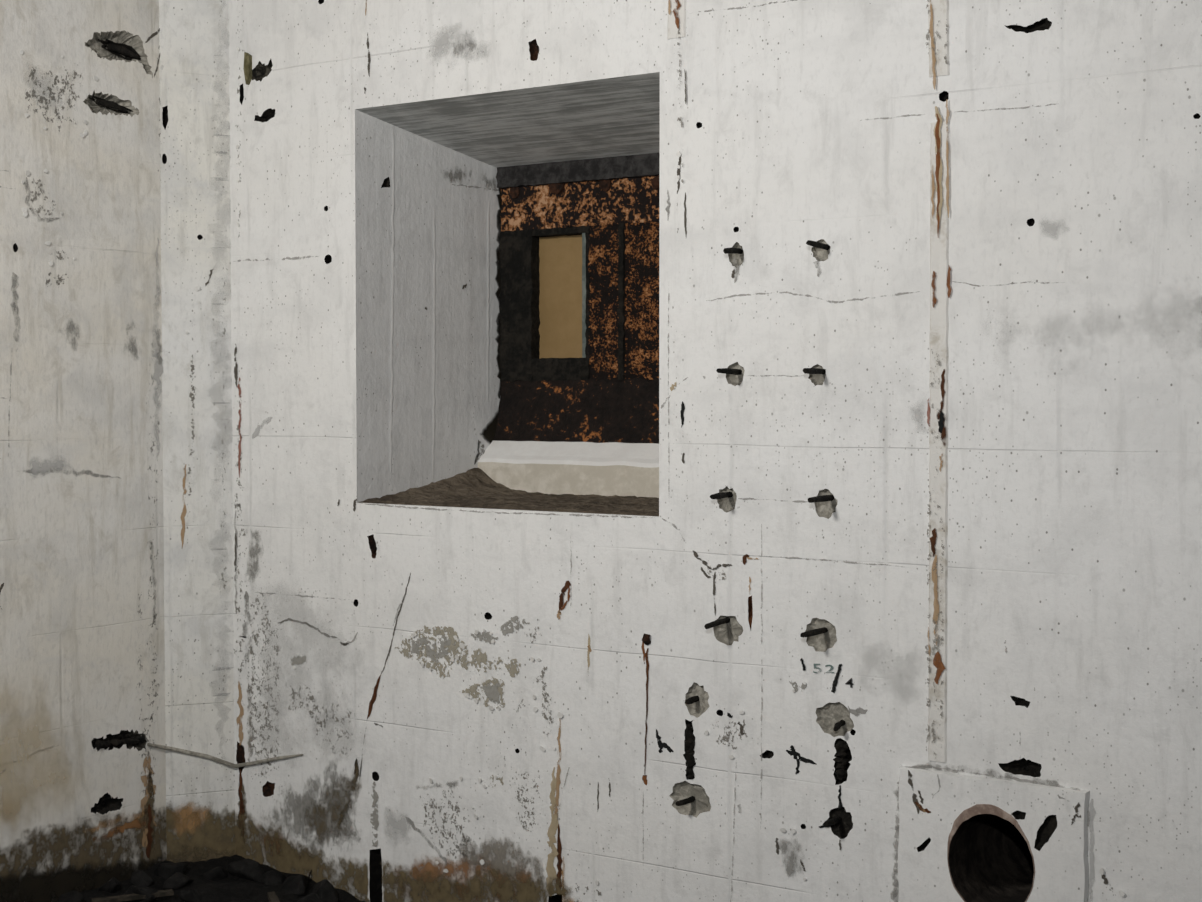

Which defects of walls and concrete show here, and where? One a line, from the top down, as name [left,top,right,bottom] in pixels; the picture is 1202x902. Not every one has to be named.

spalling [85,30,164,78]
rust [926,0,948,90]
rust [931,99,950,238]
rust [931,266,951,308]
damp [153,331,163,400]
damp [243,532,260,635]
rust [925,491,946,754]
crack [359,573,411,780]
peeling [395,616,563,752]
damp [0,762,573,902]
peeling [478,767,540,831]